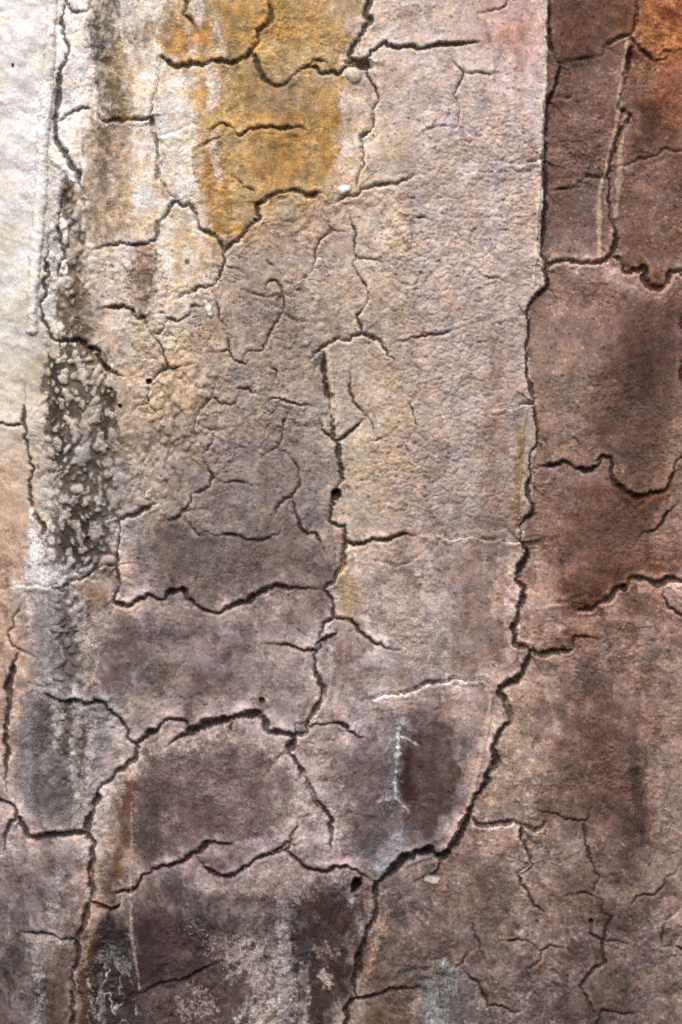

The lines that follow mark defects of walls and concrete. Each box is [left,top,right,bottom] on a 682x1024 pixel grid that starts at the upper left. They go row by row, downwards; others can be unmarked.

crack [0,218,410,1024]
water stain [11,175,461,1024]
crack [39,0,478,405]
corrosion [156,0,362,256]
crack [343,0,682,1024]